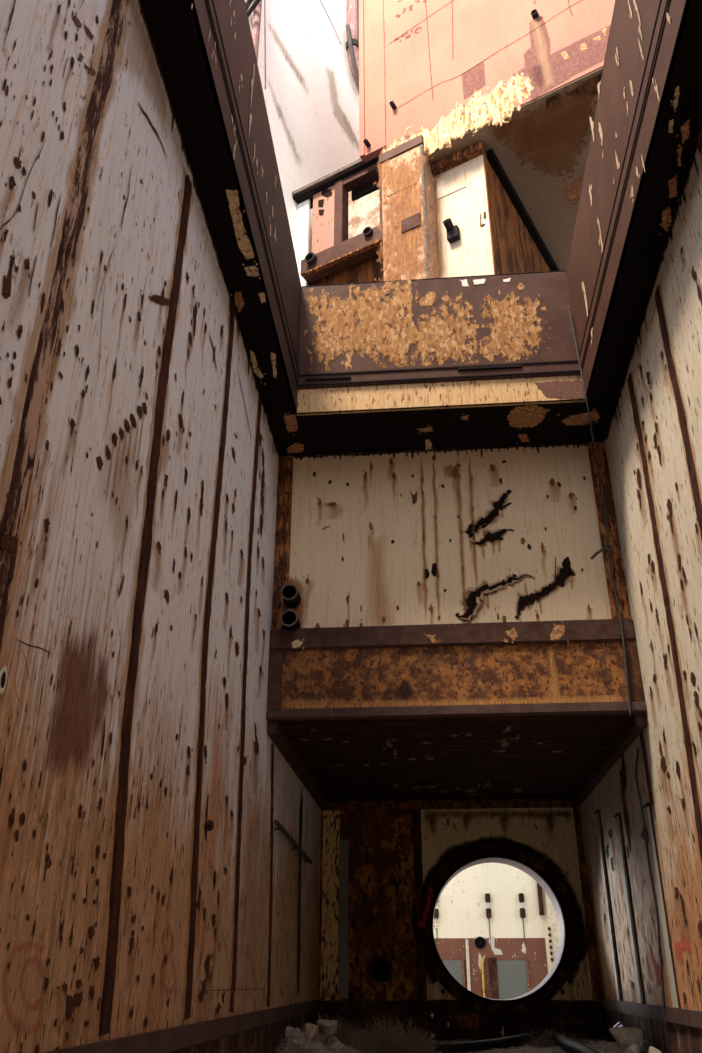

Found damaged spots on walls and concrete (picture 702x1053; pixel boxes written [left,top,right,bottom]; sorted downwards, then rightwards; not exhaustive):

peeling [225,190,261,279]
peeling [239,44,276,239]
peeling [299,73,550,371]
corrosion [492,16,611,205]
corrosion [0,0,126,668]
corrosion [225,394,265,570]
peeling [507,405,600,444]
corrosion [0,167,224,1050]
corrosion [288,649,620,709]
corrosion [191,584,265,1022]